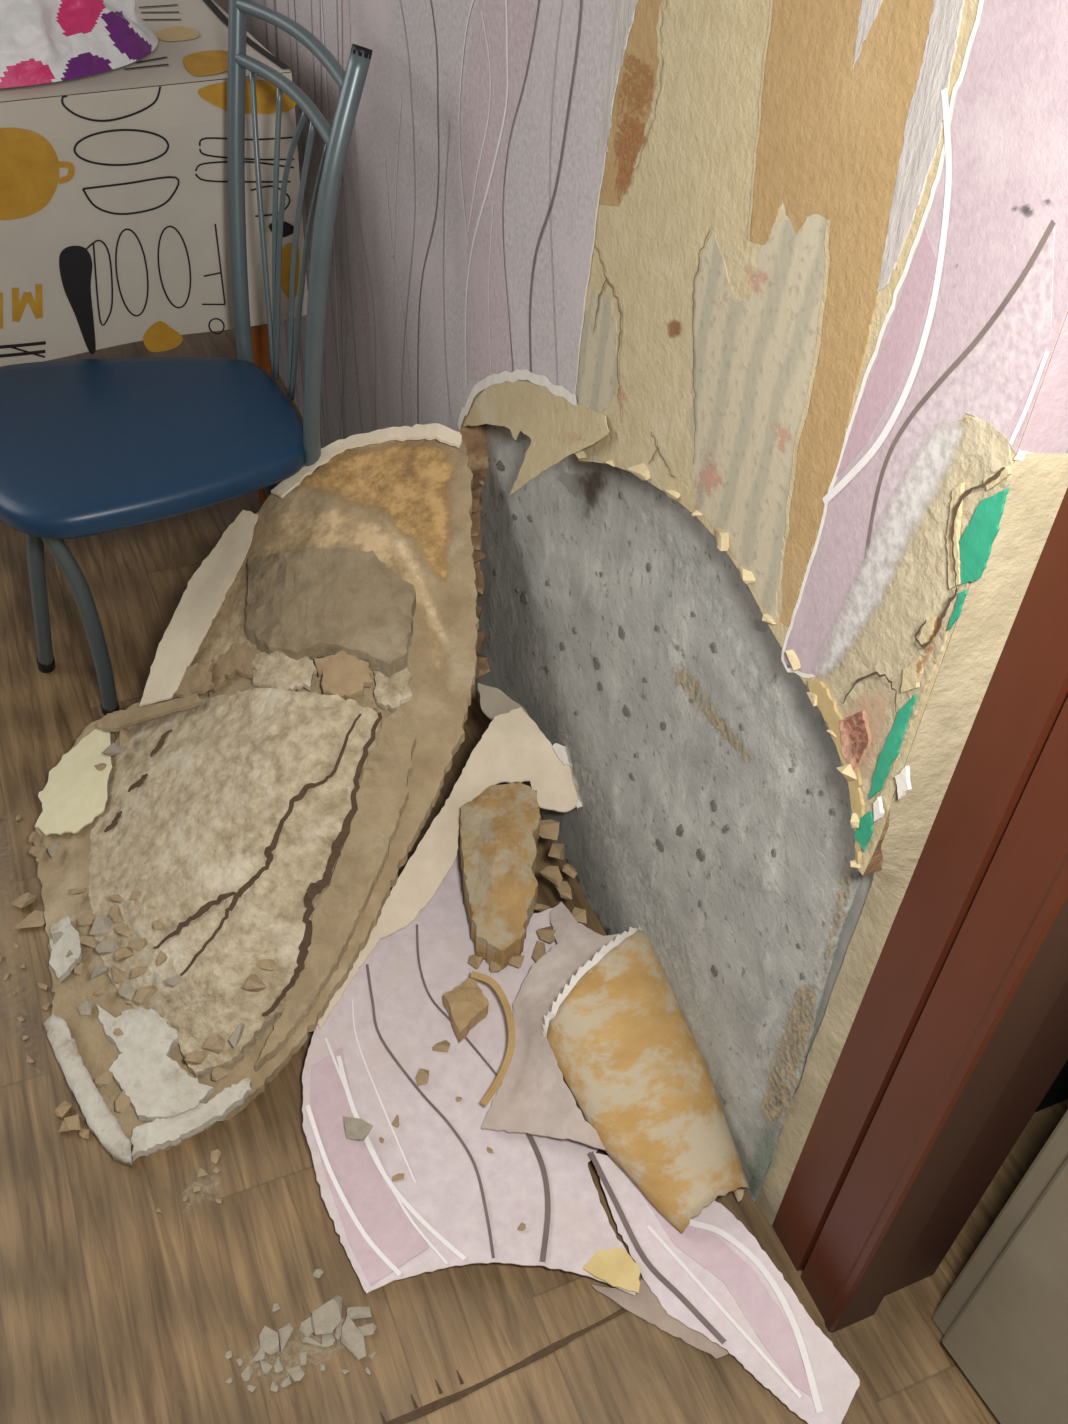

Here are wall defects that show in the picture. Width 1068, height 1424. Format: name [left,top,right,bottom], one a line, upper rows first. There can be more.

corrosion [615,57,653,197]
flaking render [457,369,1015,1202]